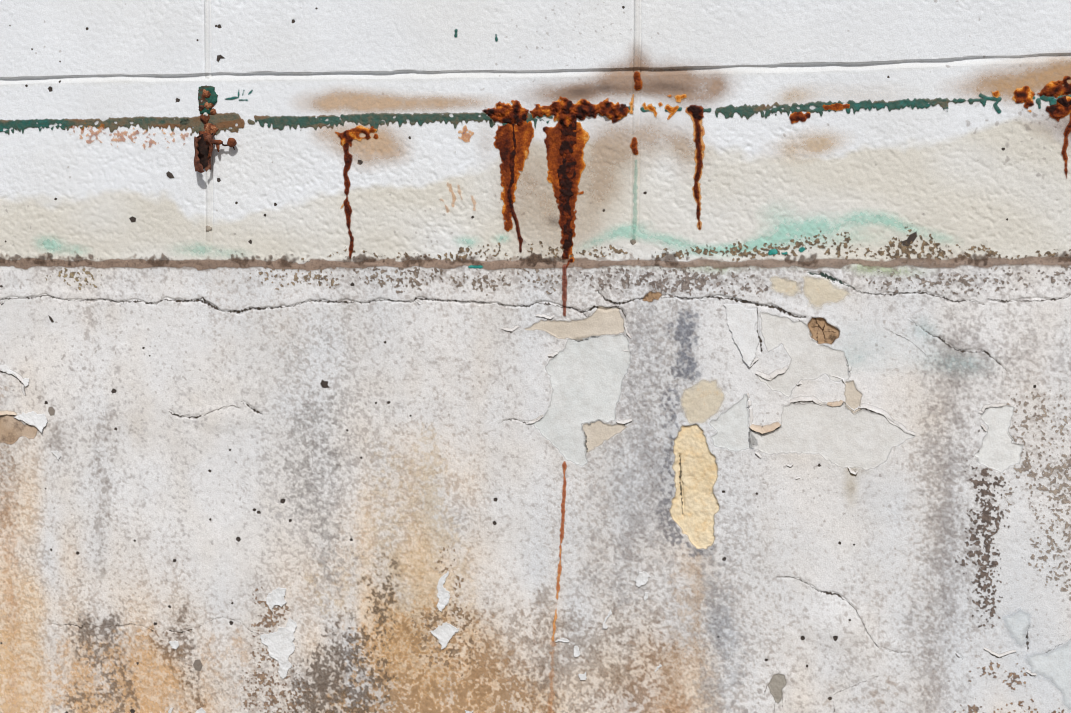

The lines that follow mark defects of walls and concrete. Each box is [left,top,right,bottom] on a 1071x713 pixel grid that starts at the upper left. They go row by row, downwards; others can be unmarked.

corrosion [992,76,1071,178]
corrosion [335,125,378,258]
corrosion [482,71,705,316]
crack [0,291,806,352]
crack [808,272,1071,302]
peeling [0,365,29,395]
peeling [0,401,55,444]
peeling [247,227,1071,549]
corrosion [552,461,567,641]
damp [70,614,164,713]
damp [292,562,535,713]
crack [785,576,902,653]